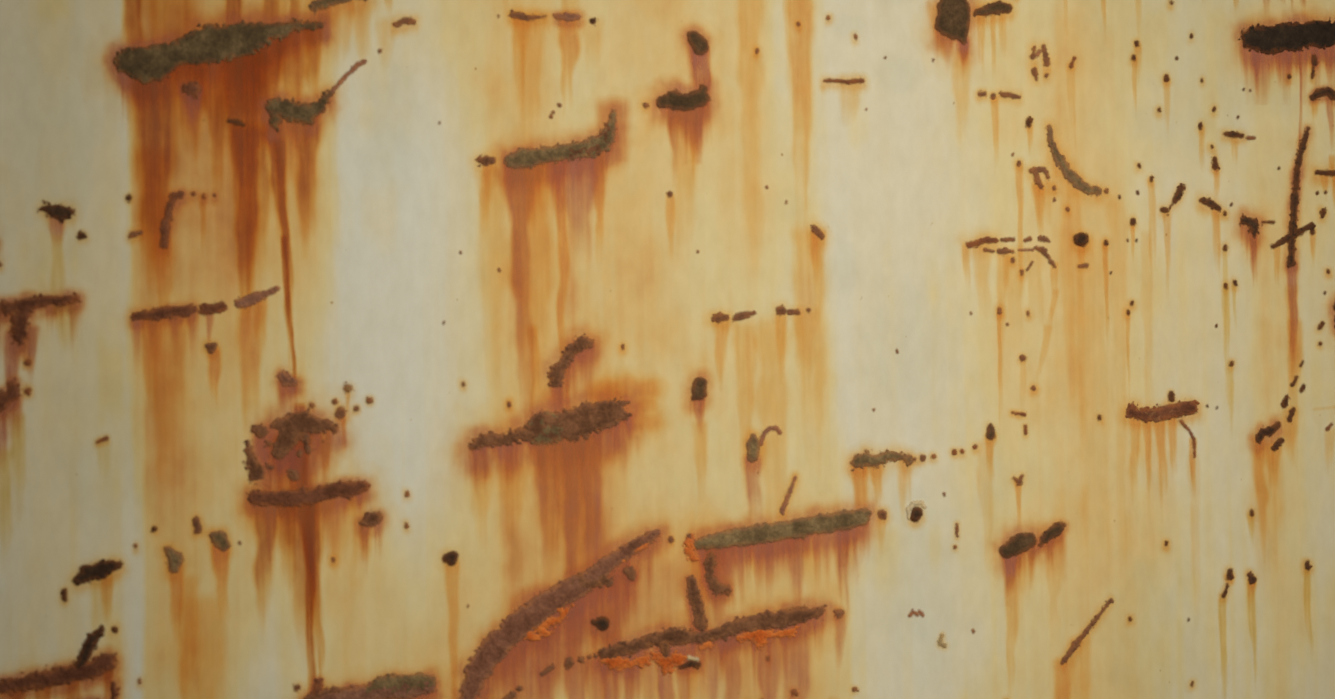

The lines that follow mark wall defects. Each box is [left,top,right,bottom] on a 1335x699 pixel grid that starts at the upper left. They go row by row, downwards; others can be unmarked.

rust [113,0,367,92]
rust [935,0,1012,44]
rust [1239,20,1335,101]
rust [475,110,617,169]
rust [1199,127,1335,268]
rust [243,381,373,507]
rust [469,397,632,450]
rust [1126,391,1218,458]
rust [999,522,1066,558]
rust [459,508,887,699]
rust [0,624,121,699]
rust [294,672,438,699]